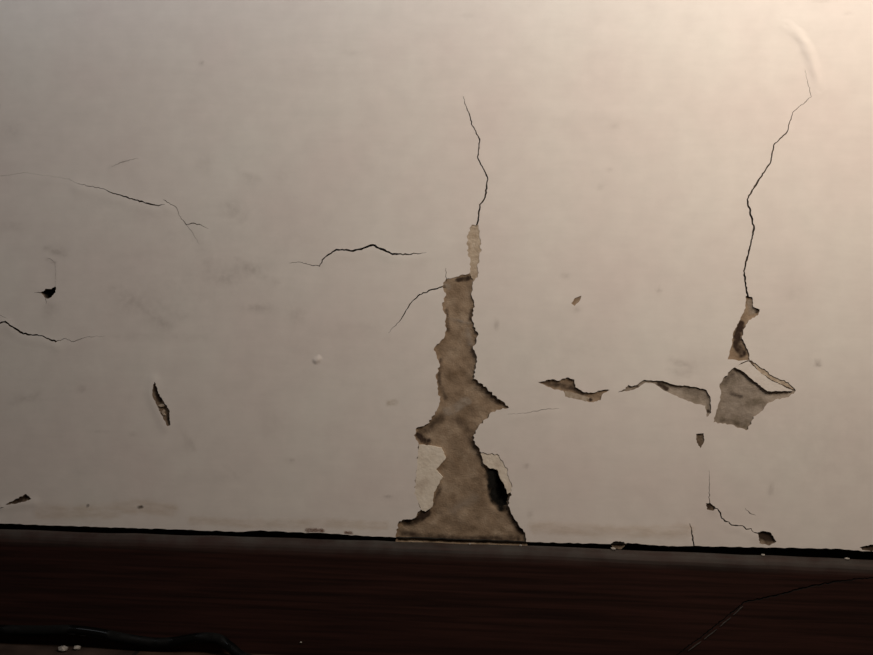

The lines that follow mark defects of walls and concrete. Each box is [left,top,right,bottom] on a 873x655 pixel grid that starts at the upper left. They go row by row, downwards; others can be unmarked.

crack [11,172,206,240]
crack [463,97,488,225]
crack [743,77,811,297]
spalling [34,258,56,300]
crack [0,315,102,342]
crack [292,244,421,267]
crack [390,270,447,331]
flaking render [152,382,170,426]
flaking render [396,225,527,546]
flaking render [539,296,796,430]
flaking render [6,494,31,505]
crack [709,477,759,534]